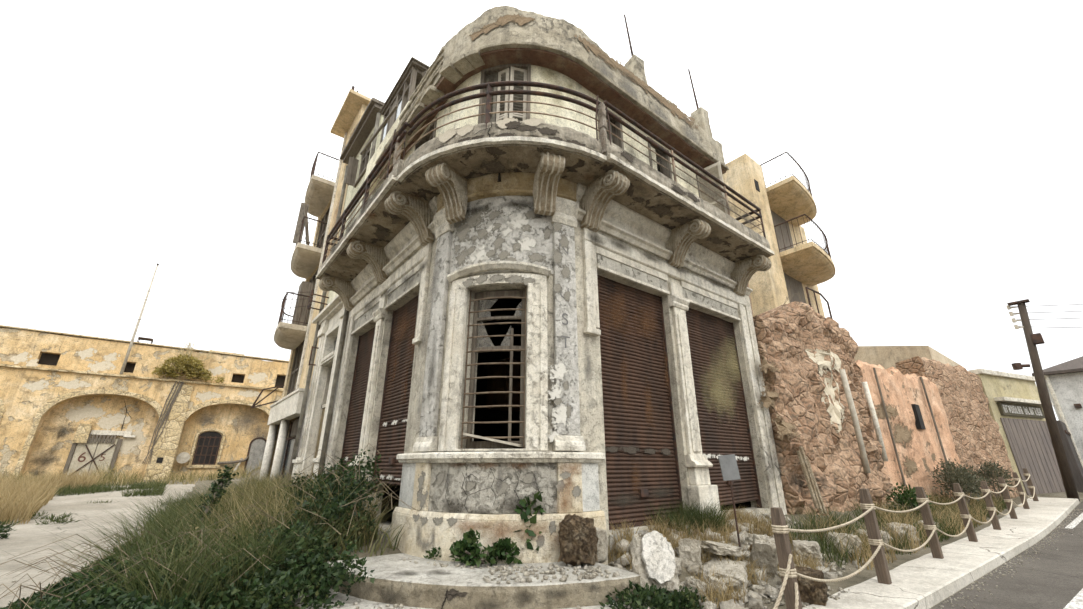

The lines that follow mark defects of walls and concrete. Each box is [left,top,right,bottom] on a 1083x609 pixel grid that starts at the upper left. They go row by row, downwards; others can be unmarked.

spalling [469,14,535,41]
spalling [436,117,586,149]
peeling [453,205,571,302]
peeling [546,360,572,443]
peeling [805,345,845,433]
crack [445,468,539,514]